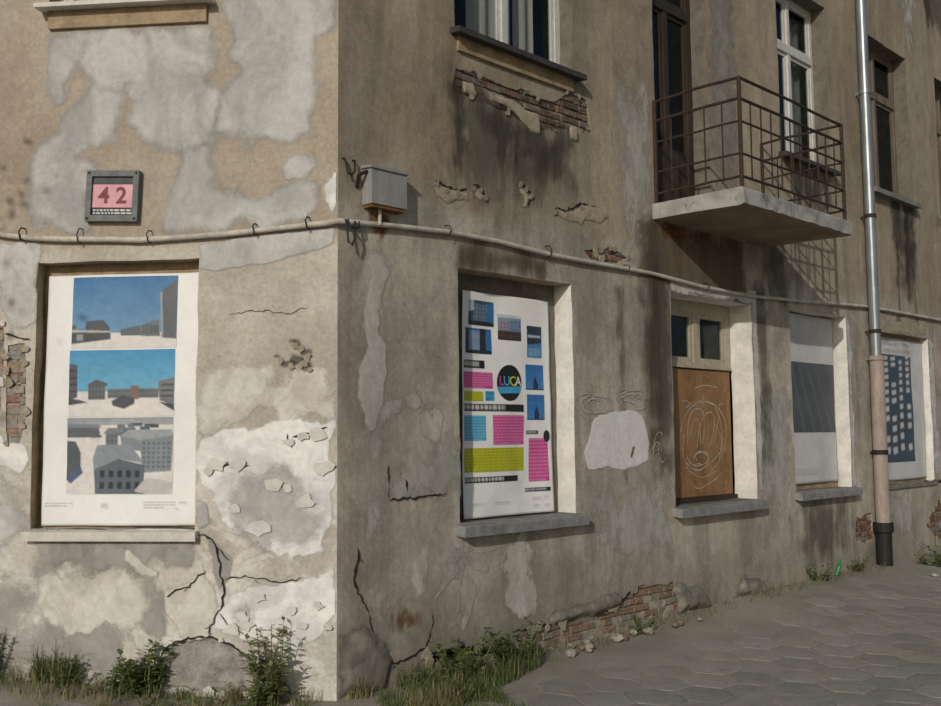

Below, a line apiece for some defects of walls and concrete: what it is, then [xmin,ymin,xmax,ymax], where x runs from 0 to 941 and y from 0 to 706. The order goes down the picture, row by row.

water stain [453,85,563,199]
flaking render [452,66,590,141]
water stain [893,203,915,301]
flaking render [0,320,31,474]
peeling [195,340,336,562]
crack [387,466,446,501]
flaking render [855,513,873,543]
flaking render [927,496,941,546]
crack [162,534,300,662]
crack [353,548,373,632]
crack [392,587,639,670]
flaking render [421,532,679,670]